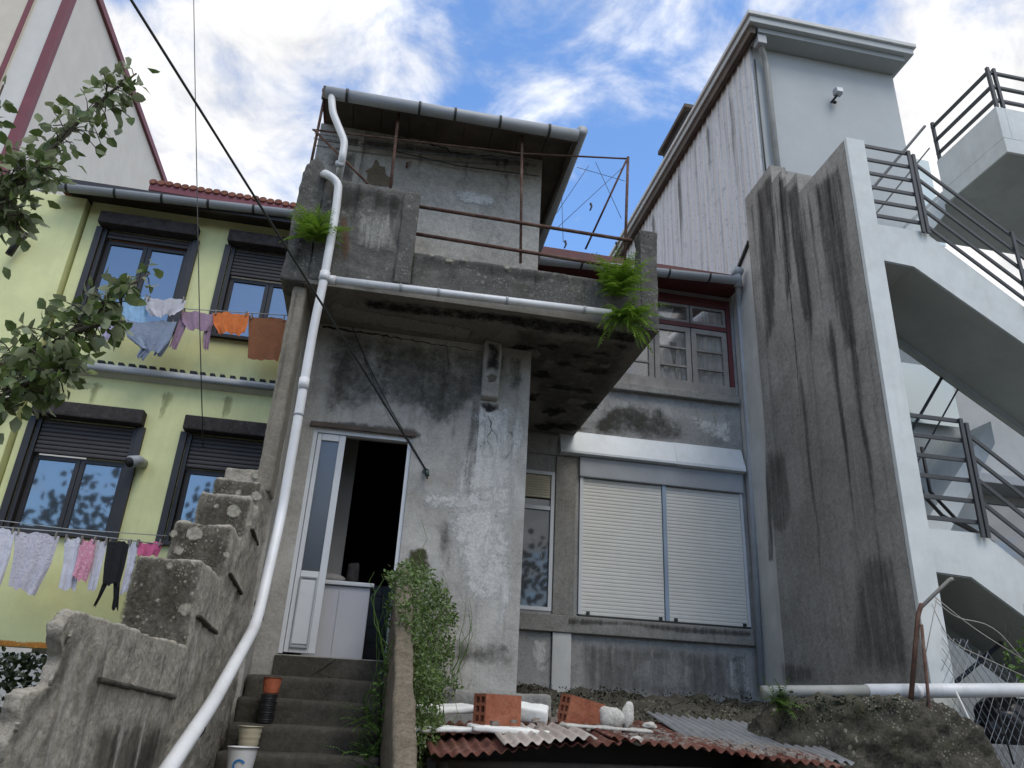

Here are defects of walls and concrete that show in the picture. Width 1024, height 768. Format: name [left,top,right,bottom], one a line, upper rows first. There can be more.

damp [331,335,522,623]
crack [484,416,522,458]
damp [598,409,679,436]
damp [758,177,872,549]